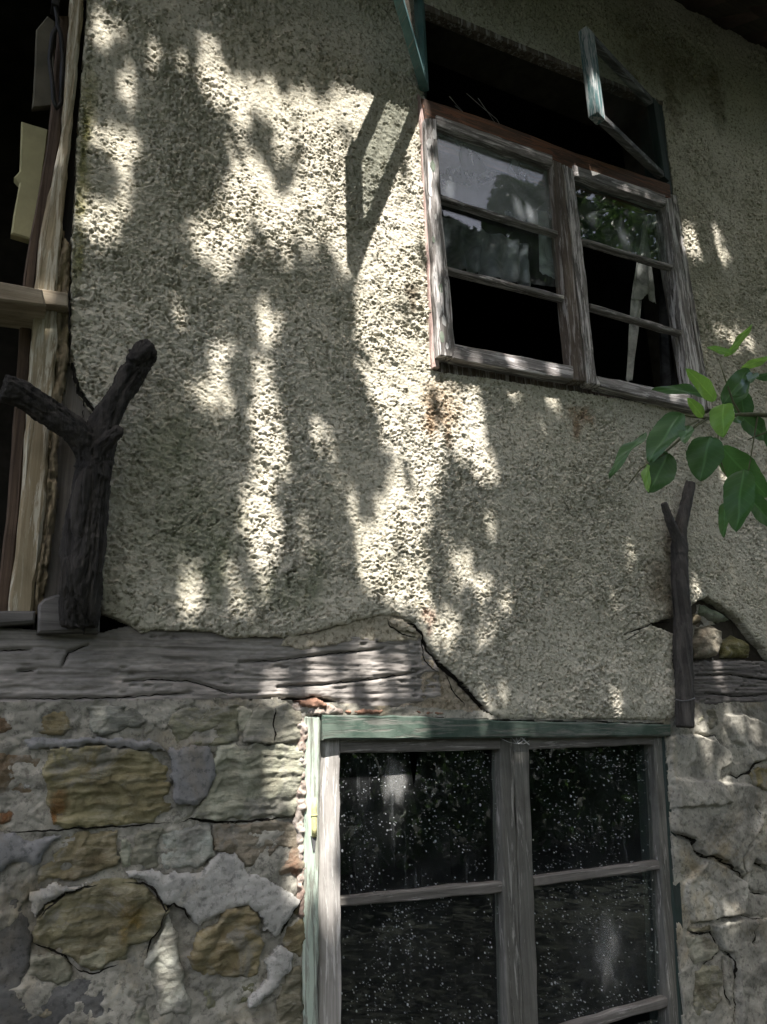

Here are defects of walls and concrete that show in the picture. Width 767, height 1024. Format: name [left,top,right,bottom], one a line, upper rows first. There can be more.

crack [256,619,492,715]
spalling [692,604,749,660]